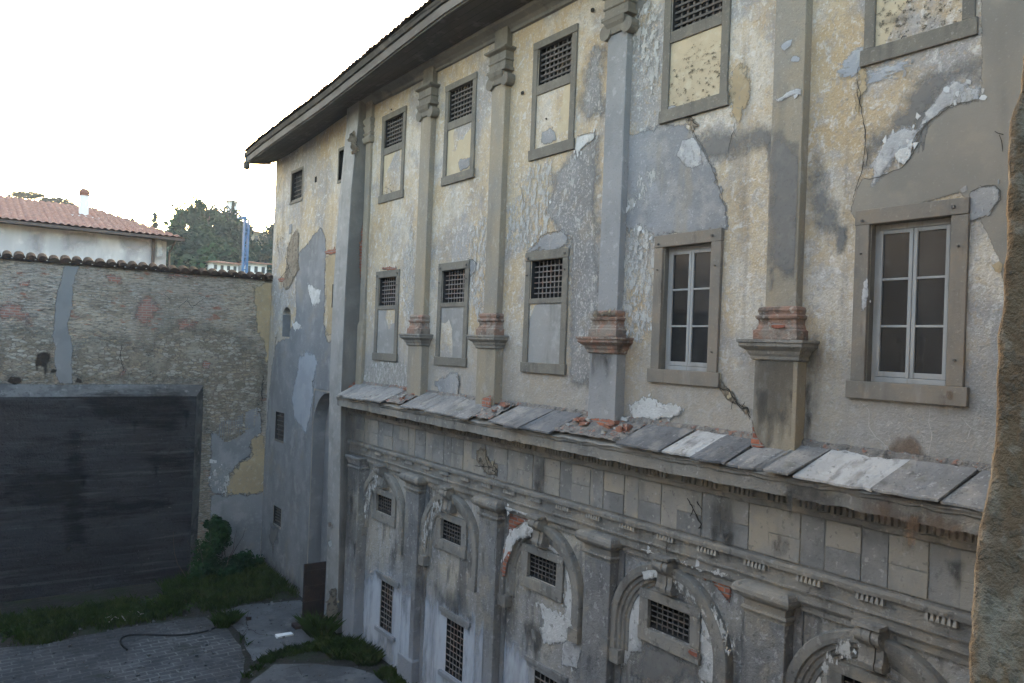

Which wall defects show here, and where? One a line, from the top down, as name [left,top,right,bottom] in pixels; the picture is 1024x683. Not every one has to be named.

peeling [677,116,727,227]
water stain [813,169,846,252]
crack [853,69,868,197]
peeling [851,79,987,207]
peeling [253,224,324,362]
peeling [308,246,336,336]
peeling [205,408,265,497]
peeling [629,393,684,428]
crack [720,388,751,420]
peeling [500,503,533,577]
crack [687,498,702,529]
peeling [531,570,581,671]